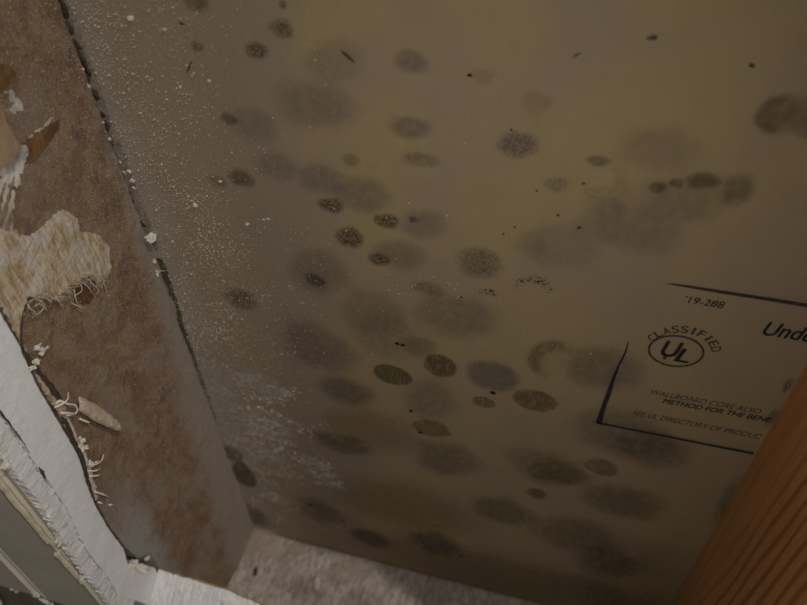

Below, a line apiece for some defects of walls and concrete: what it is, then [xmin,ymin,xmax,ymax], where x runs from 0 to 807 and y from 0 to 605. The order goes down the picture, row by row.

peeling [0,64,60,170]
leakage [156,258,216,418]
leakage [375,365,411,385]